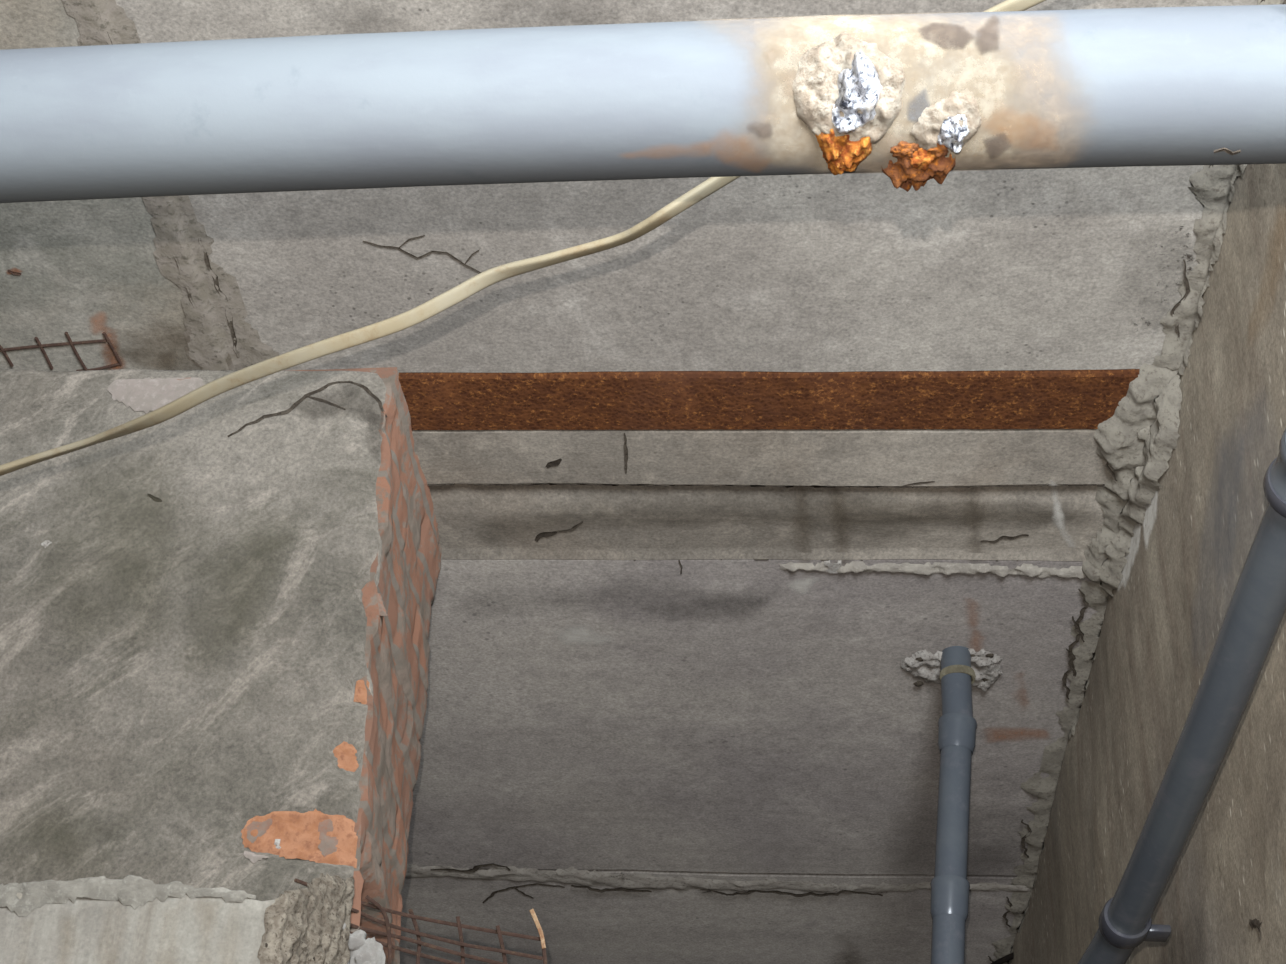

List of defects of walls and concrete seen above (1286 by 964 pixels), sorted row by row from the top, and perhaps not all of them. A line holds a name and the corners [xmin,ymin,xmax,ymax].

peeling [0,332,205,414]
crack [228,381,387,437]
spalling [241,808,372,964]
crack [482,883,565,903]